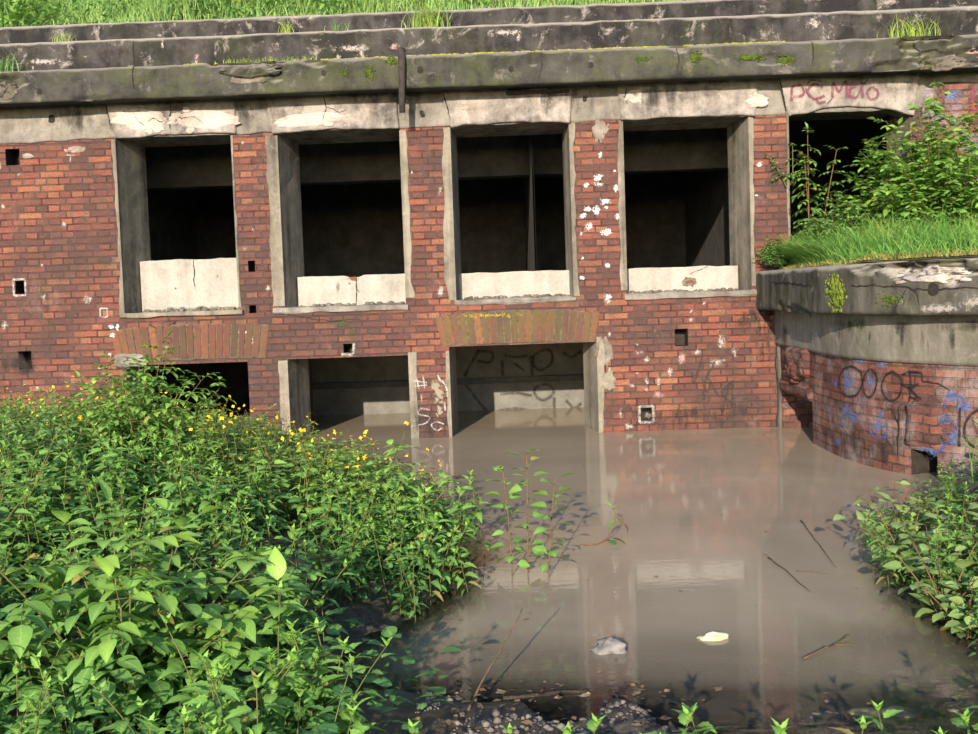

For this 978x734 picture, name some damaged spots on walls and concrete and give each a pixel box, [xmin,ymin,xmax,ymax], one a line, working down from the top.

spalling [917,48,978,72]
spalling [0,81,18,101]
crack [132,105,203,130]
spalling [895,265,974,284]
spalling [594,336,616,391]